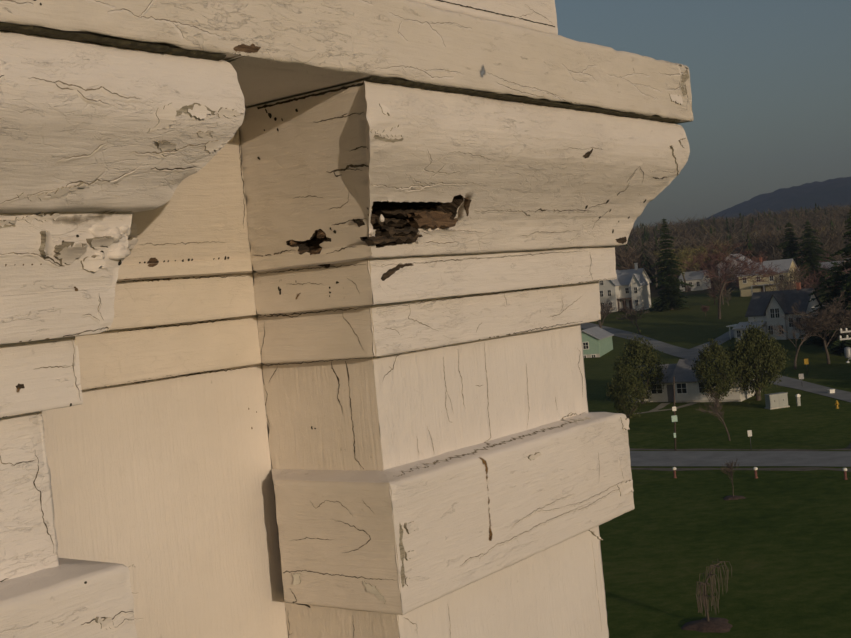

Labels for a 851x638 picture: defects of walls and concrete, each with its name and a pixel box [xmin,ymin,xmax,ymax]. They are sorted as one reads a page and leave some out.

peeling [147,103,242,133]
peeling [0,212,139,272]
crack [0,143,206,207]
spalling [381,263,413,281]
crack [326,146,495,194]
peeling [415,229,468,243]
crack [421,167,669,247]
crack [443,256,593,447]
crack [331,361,364,469]
crack [0,455,54,553]
crack [460,452,630,568]
crack [283,570,393,638]